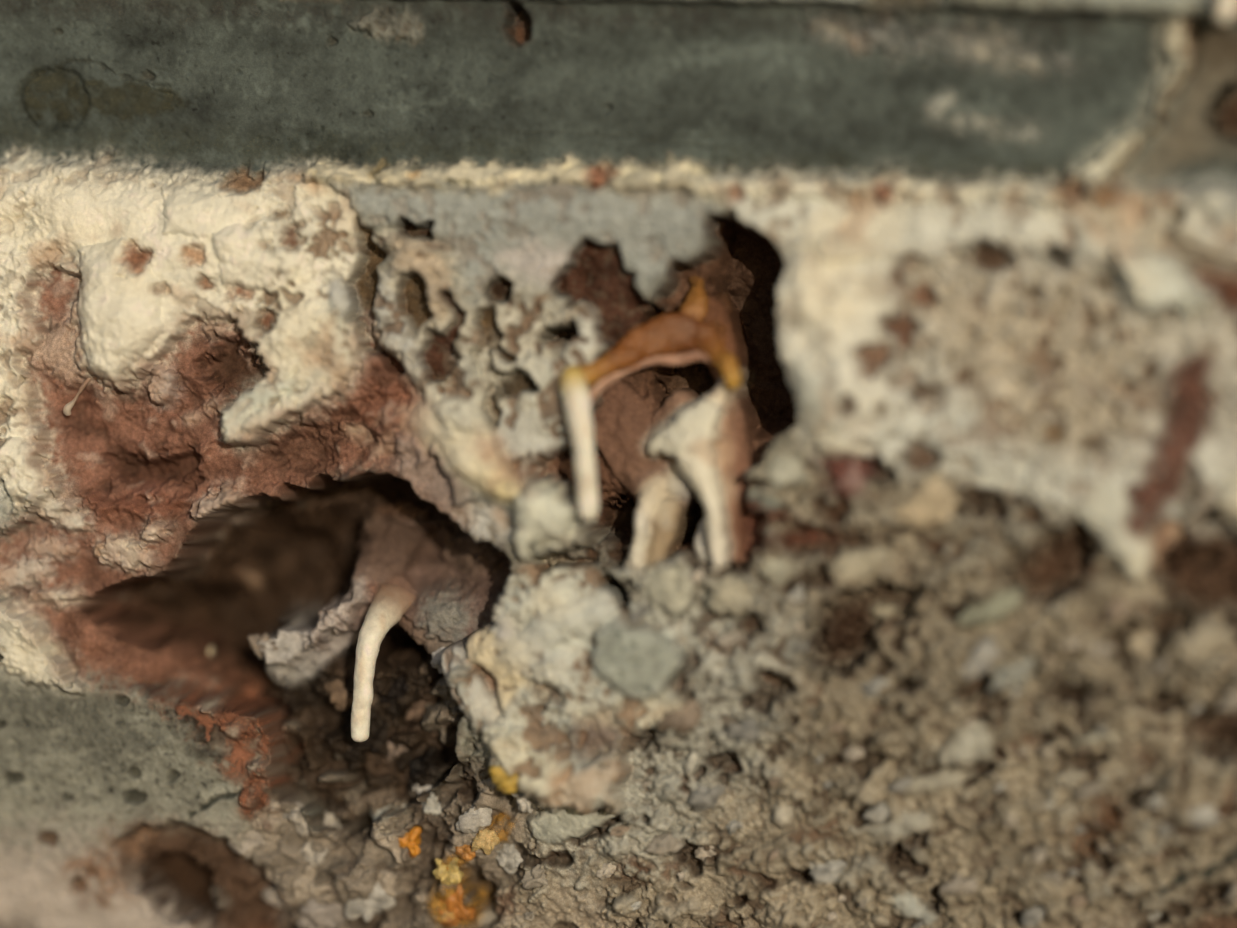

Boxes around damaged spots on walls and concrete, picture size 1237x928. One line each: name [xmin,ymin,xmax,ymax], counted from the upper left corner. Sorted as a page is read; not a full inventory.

spalling [221,170,265,194]
spalling [271,208,301,252]
leakage [0,70,1237,517]
spalling [722,184,744,204]
crack [1099,17,1201,192]
corrosion [1126,356,1212,538]
spalling [0,217,1237,928]
corrosion [160,688,290,817]